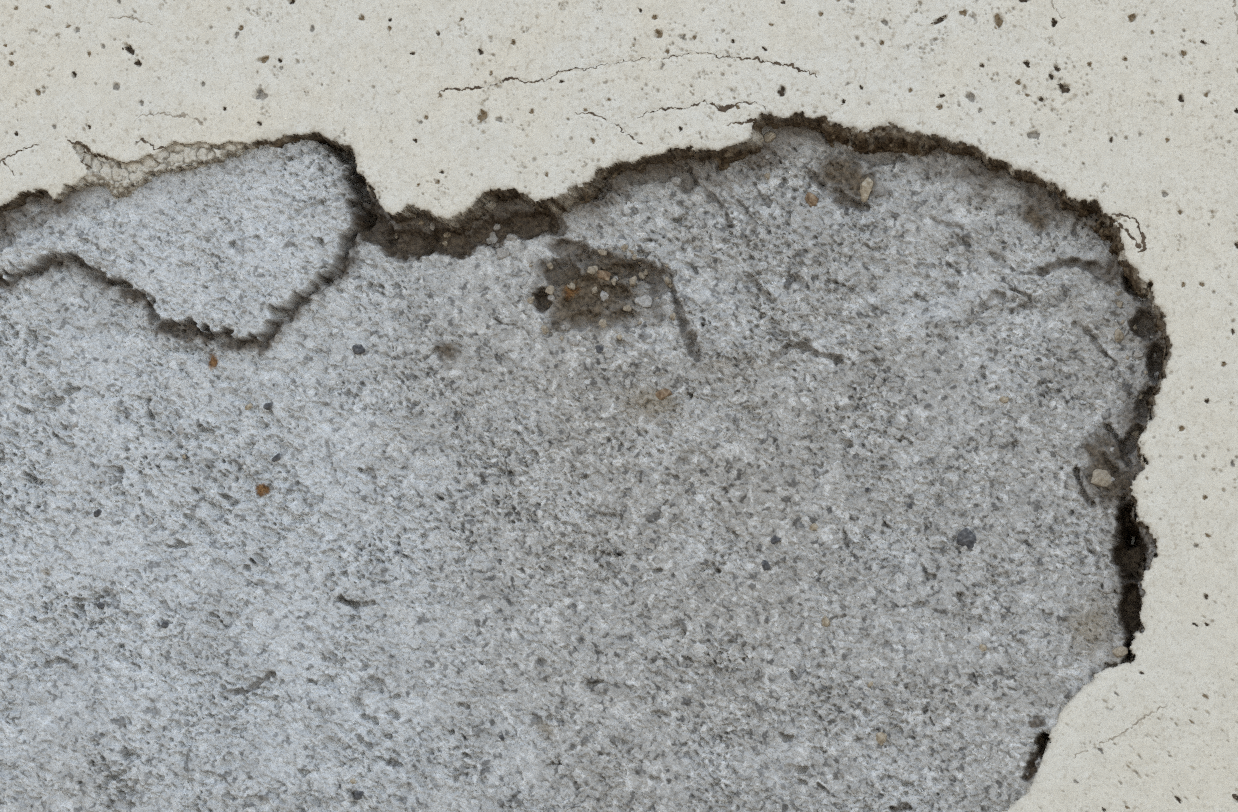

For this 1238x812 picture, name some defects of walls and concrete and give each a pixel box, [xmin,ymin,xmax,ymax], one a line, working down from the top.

crack [439,52,817,93]
crack [134,112,203,150]
spalling [764,131,776,143]
crack [0,139,109,175]
spalling [859,177,873,202]
spalling [0,189,49,212]
spalling [591,266,611,281]
spalling [634,295,652,308]
spalling [655,388,673,400]
spalling [1091,469,1115,487]
spalling [1103,577,1114,594]
spalling [1112,646,1128,658]